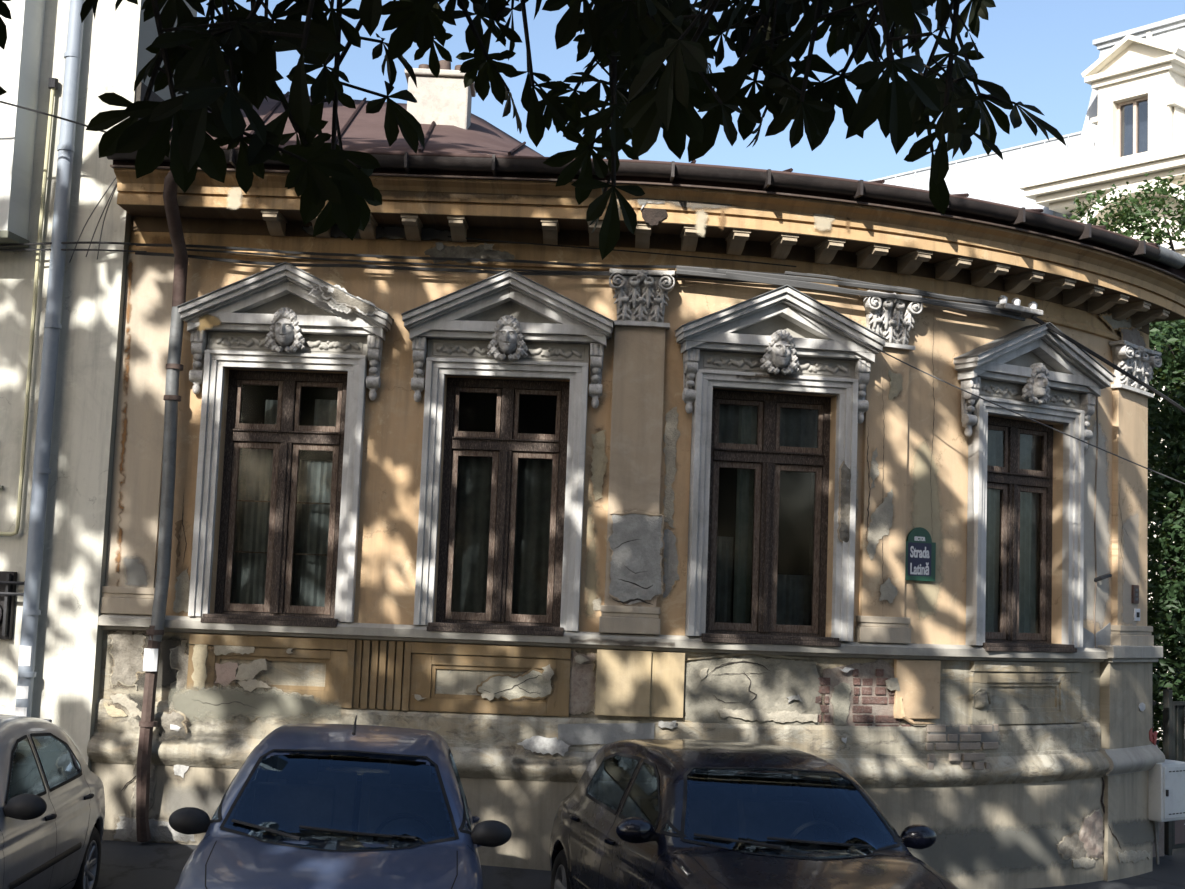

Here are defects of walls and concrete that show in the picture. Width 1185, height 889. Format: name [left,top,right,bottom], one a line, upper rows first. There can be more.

peeling [888,370,903,400]
peeling [590,429,608,501]
peeling [837,447,893,560]
flaking render [592,509,681,610]
peeling [879,577,898,603]
peeling [191,644,267,689]
flaking render [104,693,240,741]
flaking render [683,653,1002,770]